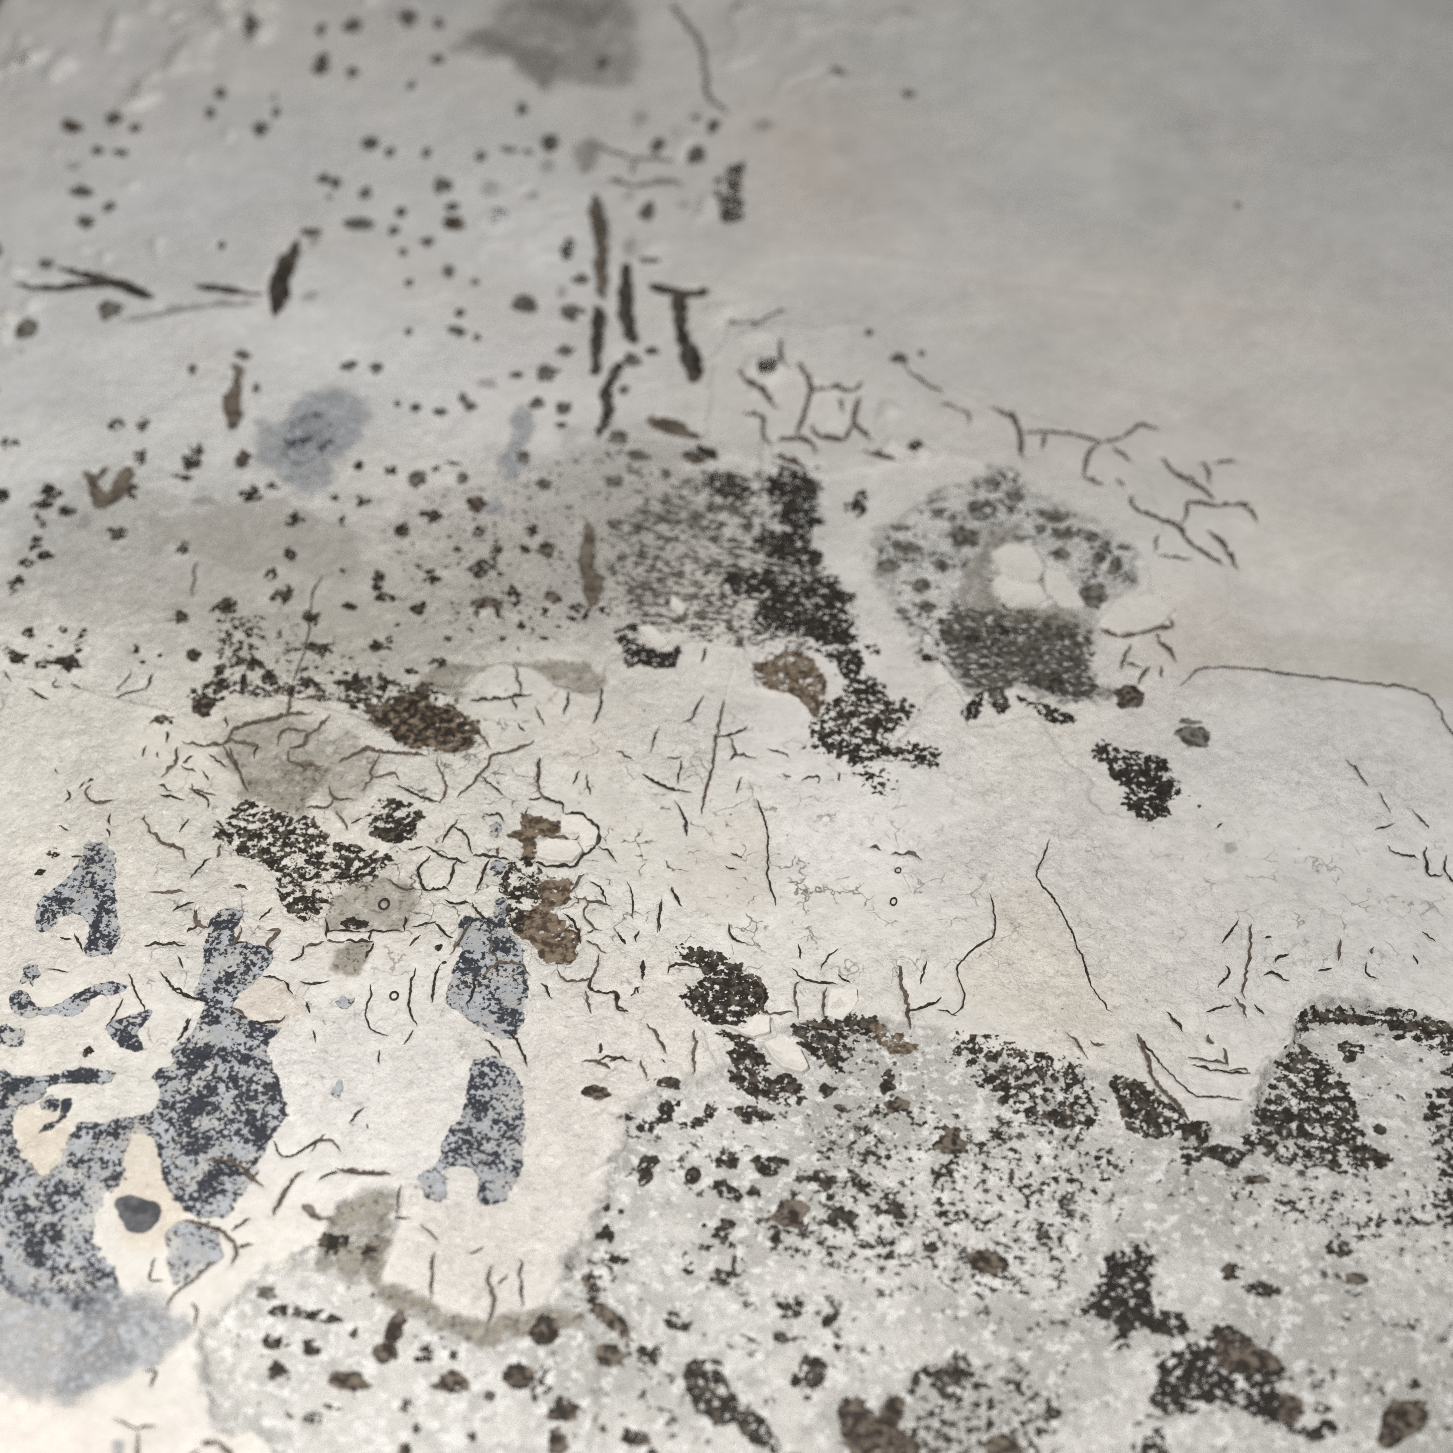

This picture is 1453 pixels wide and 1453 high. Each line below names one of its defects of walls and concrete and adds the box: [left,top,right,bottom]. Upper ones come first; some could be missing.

spalling [577,518,622,607]
peeling [637,625,668,650]
peeling [670,594,686,615]
flaking render [872,466,1198,704]
damp [34,840,120,957]
crack [52,575,700,1078]
crack [616,646,840,905]
crack [728,925,850,1030]
crack [897,895,996,1029]
crack [1035,839,1376,1122]
damp [0,908,289,1400]
flaking render [196,988,1453,1453]